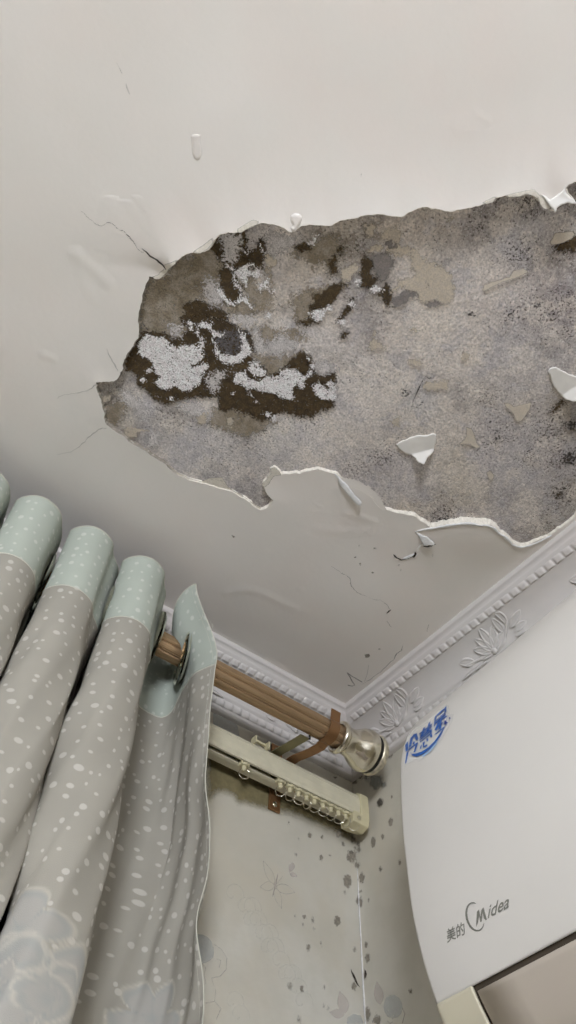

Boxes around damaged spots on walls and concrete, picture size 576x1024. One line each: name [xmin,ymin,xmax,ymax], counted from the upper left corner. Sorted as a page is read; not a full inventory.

crack [107,222,166,269]
water stain [105,229,393,450]
spalling [96,182,576,546]